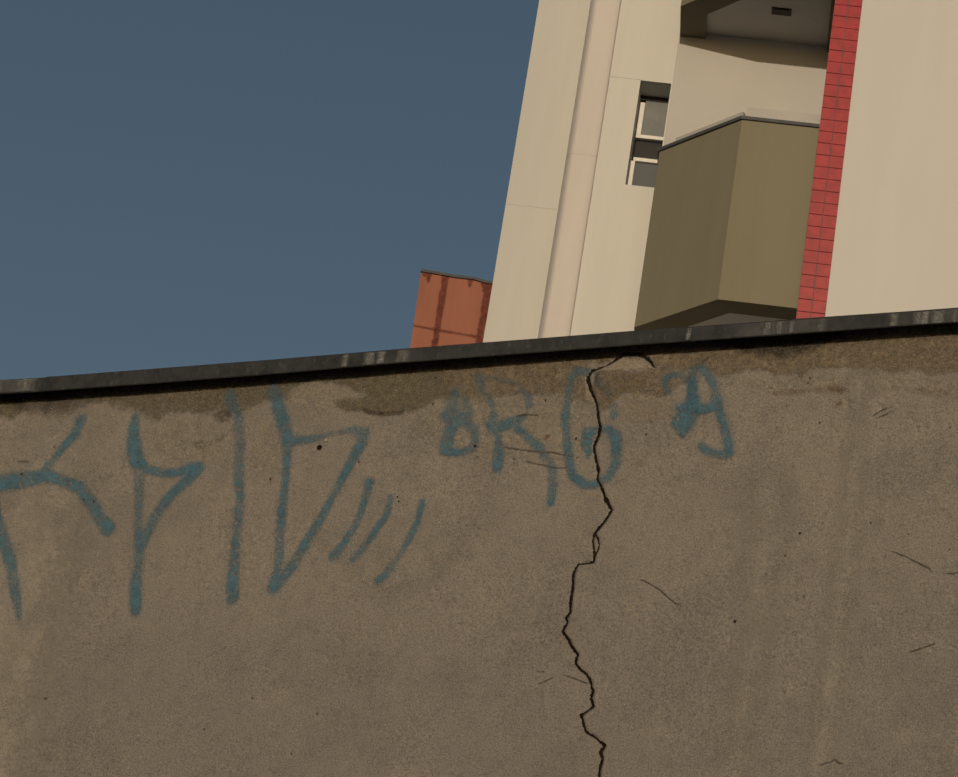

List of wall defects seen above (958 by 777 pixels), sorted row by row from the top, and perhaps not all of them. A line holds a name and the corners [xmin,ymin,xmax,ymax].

leakage [0,312,958,777]
crack [506,352,656,777]